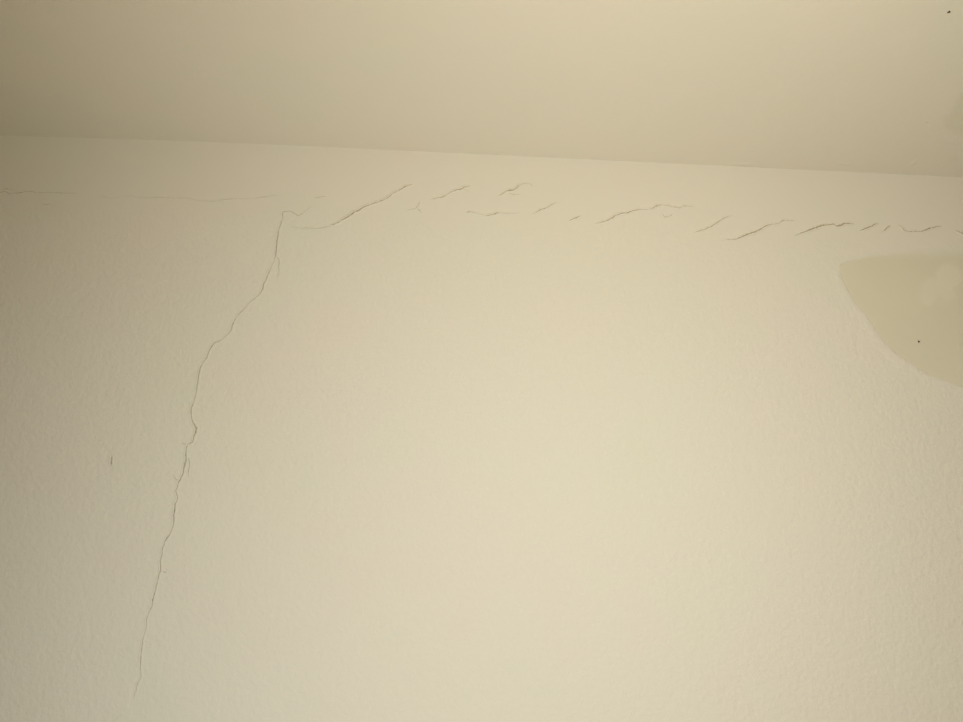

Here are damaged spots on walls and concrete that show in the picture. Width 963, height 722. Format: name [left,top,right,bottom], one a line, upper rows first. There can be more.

crack [132,182,963,699]